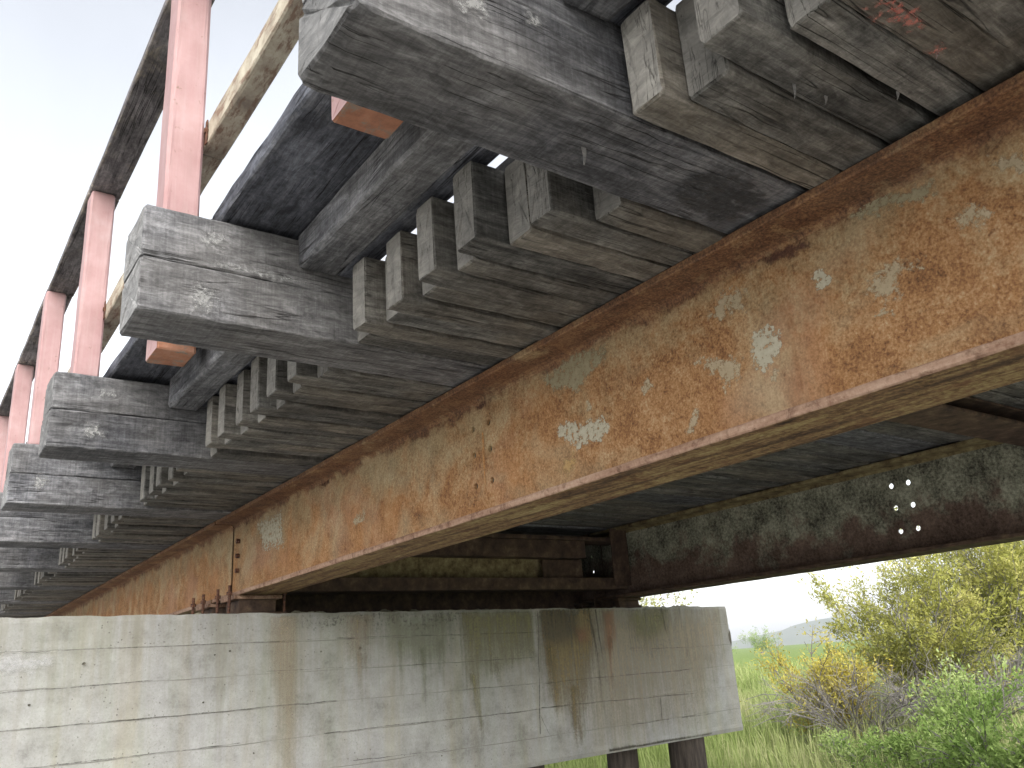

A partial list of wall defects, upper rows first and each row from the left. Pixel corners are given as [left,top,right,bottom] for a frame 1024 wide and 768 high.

peeling [954,203,992,229]
rust [767,242,809,264]
peeling [811,269,832,290]
peeling [867,257,924,316]
peeling [708,287,746,321]
peeling [694,324,782,393]
peeling [557,401,610,474]